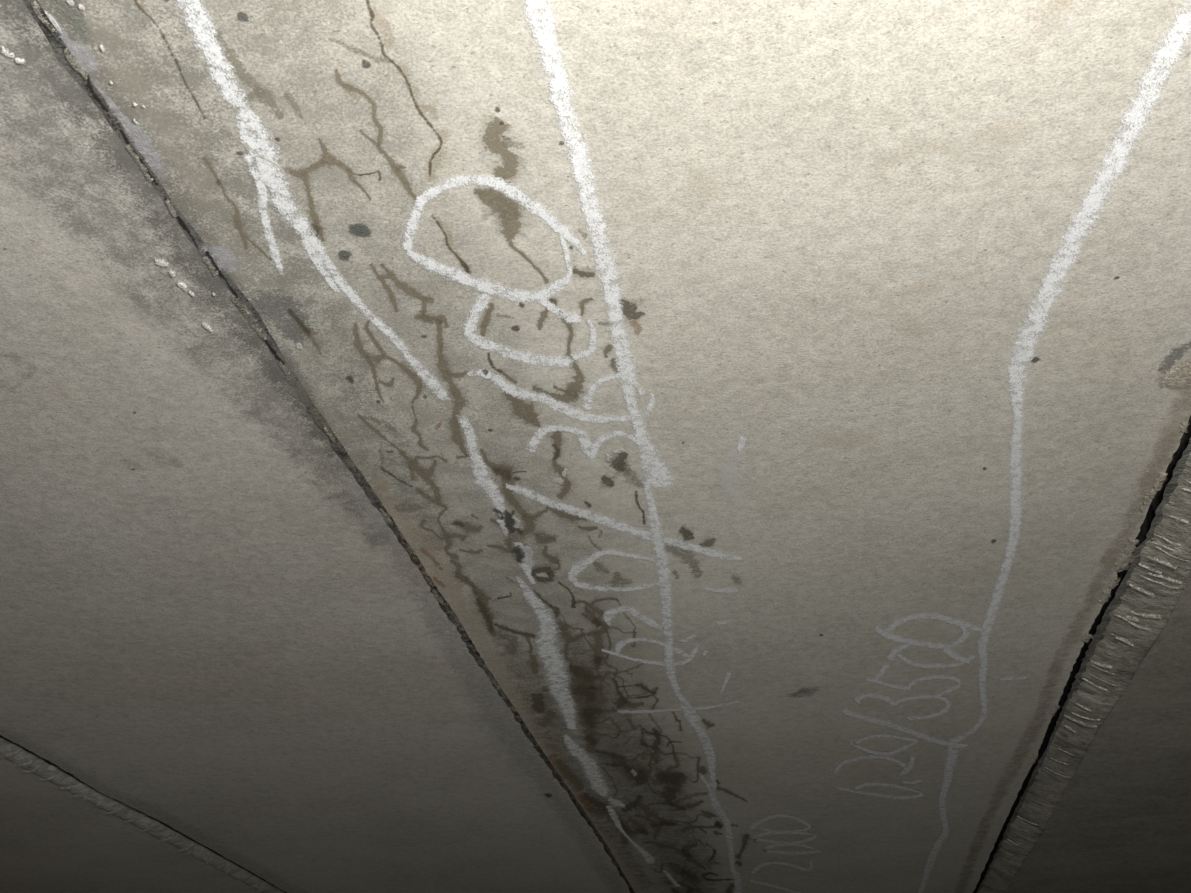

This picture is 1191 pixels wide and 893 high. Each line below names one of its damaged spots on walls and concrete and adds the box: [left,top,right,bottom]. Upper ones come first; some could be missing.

crack [135,0,206,119]
crack [241,0,470,274]
damp [1,0,338,455]
damp [474,116,548,284]
crack [292,310,322,355]
damp [618,297,645,333]
spalling [1157,344,1191,389]
damp [502,391,541,427]
damp [601,448,646,524]
spalling [1140,473,1167,512]
crack [353,263,750,893]
spalling [1098,537,1139,604]